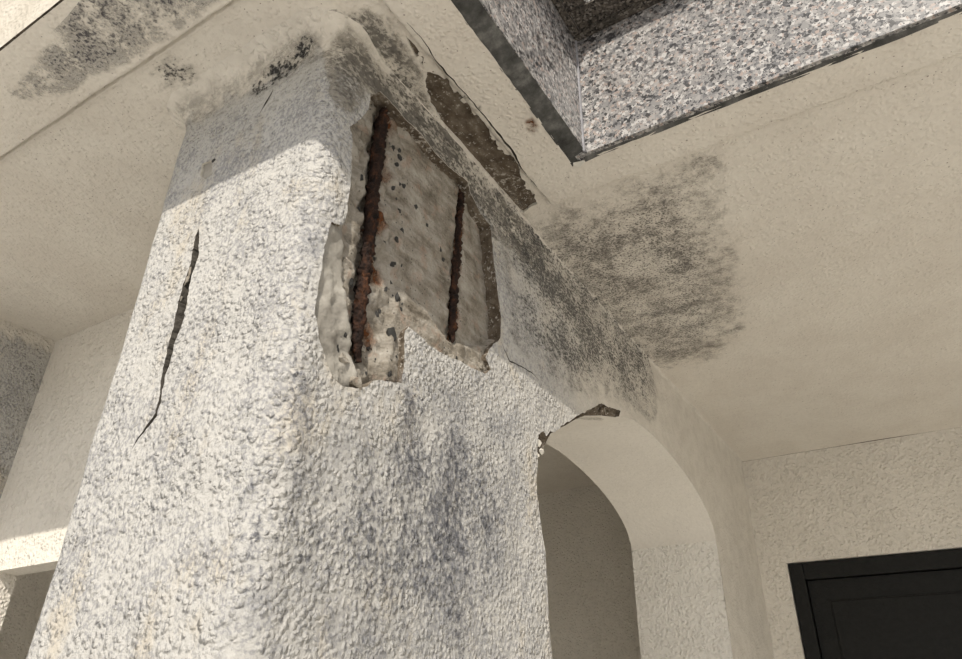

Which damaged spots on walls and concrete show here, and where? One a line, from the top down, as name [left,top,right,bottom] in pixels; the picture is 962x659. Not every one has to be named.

water stain [158,59,195,85]
water stain [251,36,313,95]
crack [130,229,199,451]
spalling [315,92,501,390]
water stain [322,10,741,404]